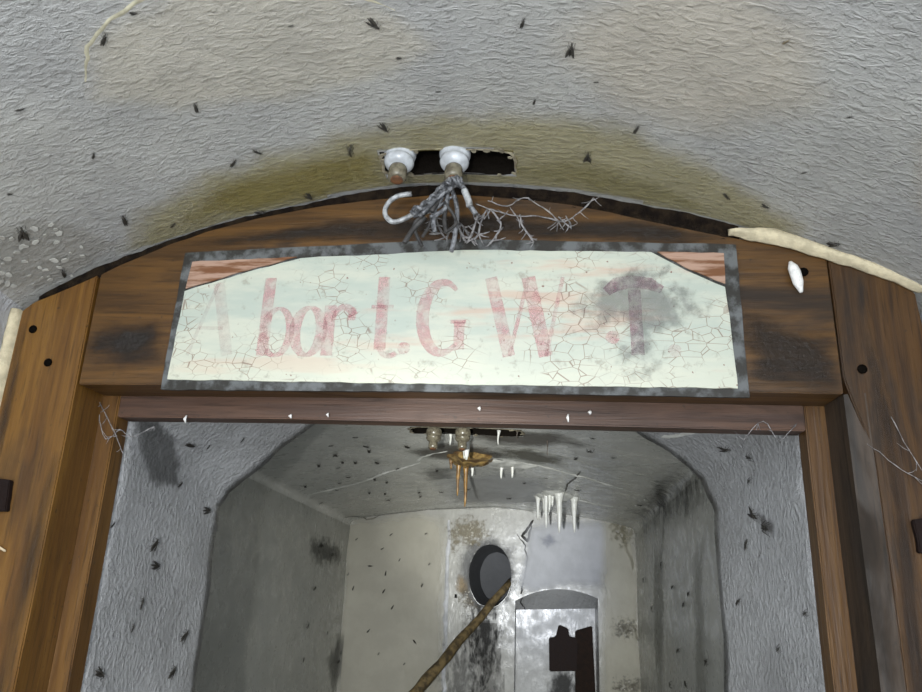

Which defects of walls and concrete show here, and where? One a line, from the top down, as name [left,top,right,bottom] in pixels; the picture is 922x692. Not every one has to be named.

damp [221,216,690,242]
damp [308,430,670,533]